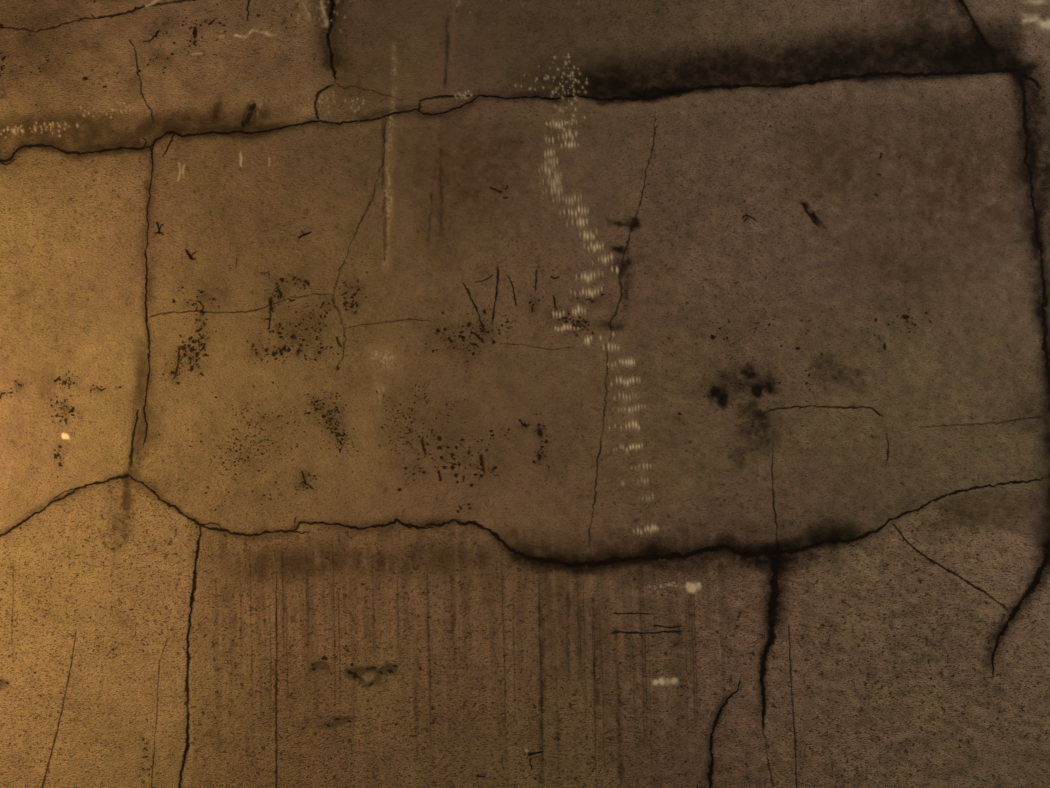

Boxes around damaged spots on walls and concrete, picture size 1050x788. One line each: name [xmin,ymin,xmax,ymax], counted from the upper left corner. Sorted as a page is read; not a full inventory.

damp [1023,17,1050,29]
damp [639,87,687,101]
damp [545,121,631,275]
crack [0,0,1050,464]
damp [550,274,635,365]
damp [703,379,728,407]
damp [739,367,780,397]
crack [592,441,602,506]
crack [770,456,778,534]
damp [686,583,701,593]
crack [0,474,1050,788]